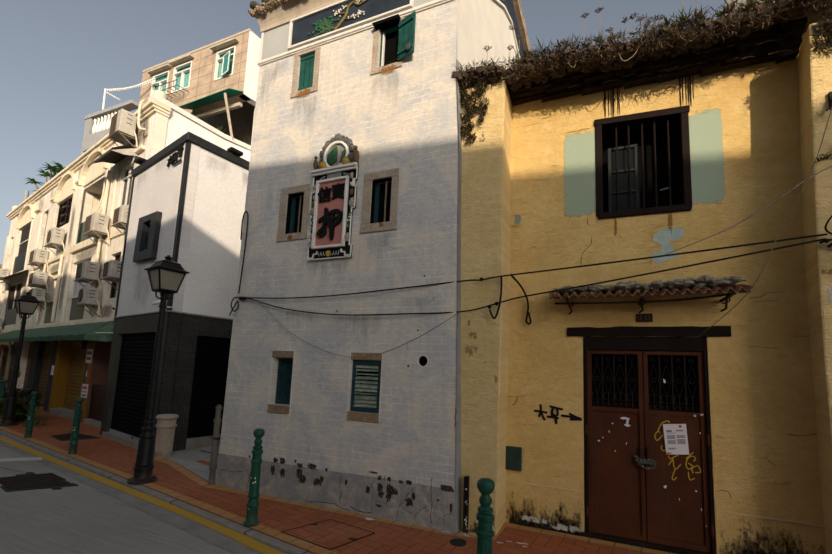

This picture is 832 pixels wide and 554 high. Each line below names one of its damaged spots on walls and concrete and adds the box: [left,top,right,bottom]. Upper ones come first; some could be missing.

damp [270,457,328,486]
damp [366,471,415,508]
mould [723,532,804,554]